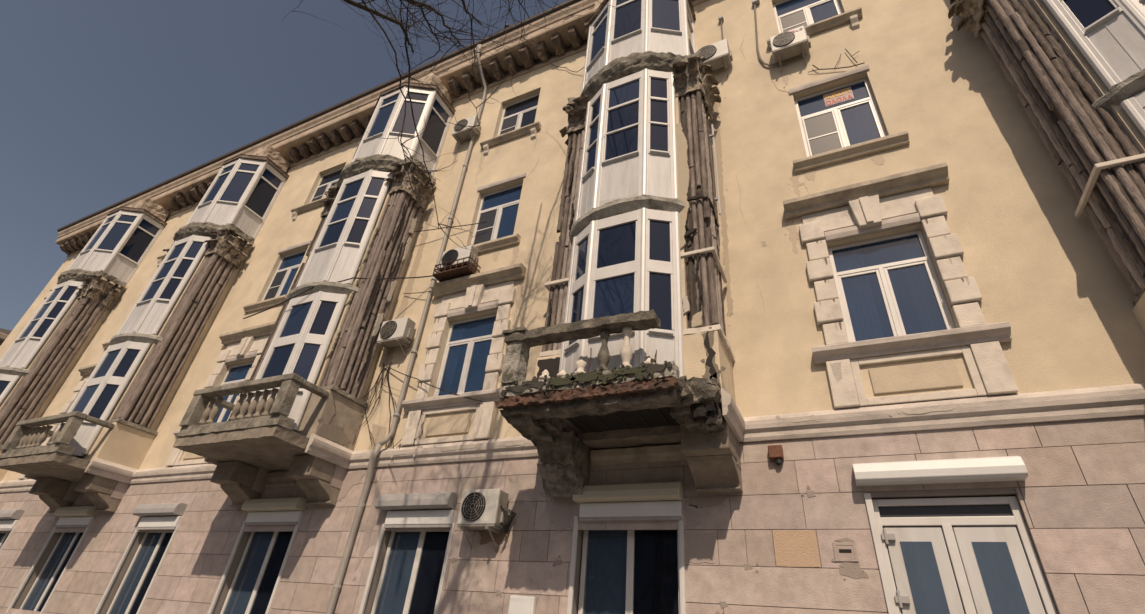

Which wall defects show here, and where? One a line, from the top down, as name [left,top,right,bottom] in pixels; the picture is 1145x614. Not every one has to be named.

flaking render [498,296,726,447]
crack [684,175,745,379]